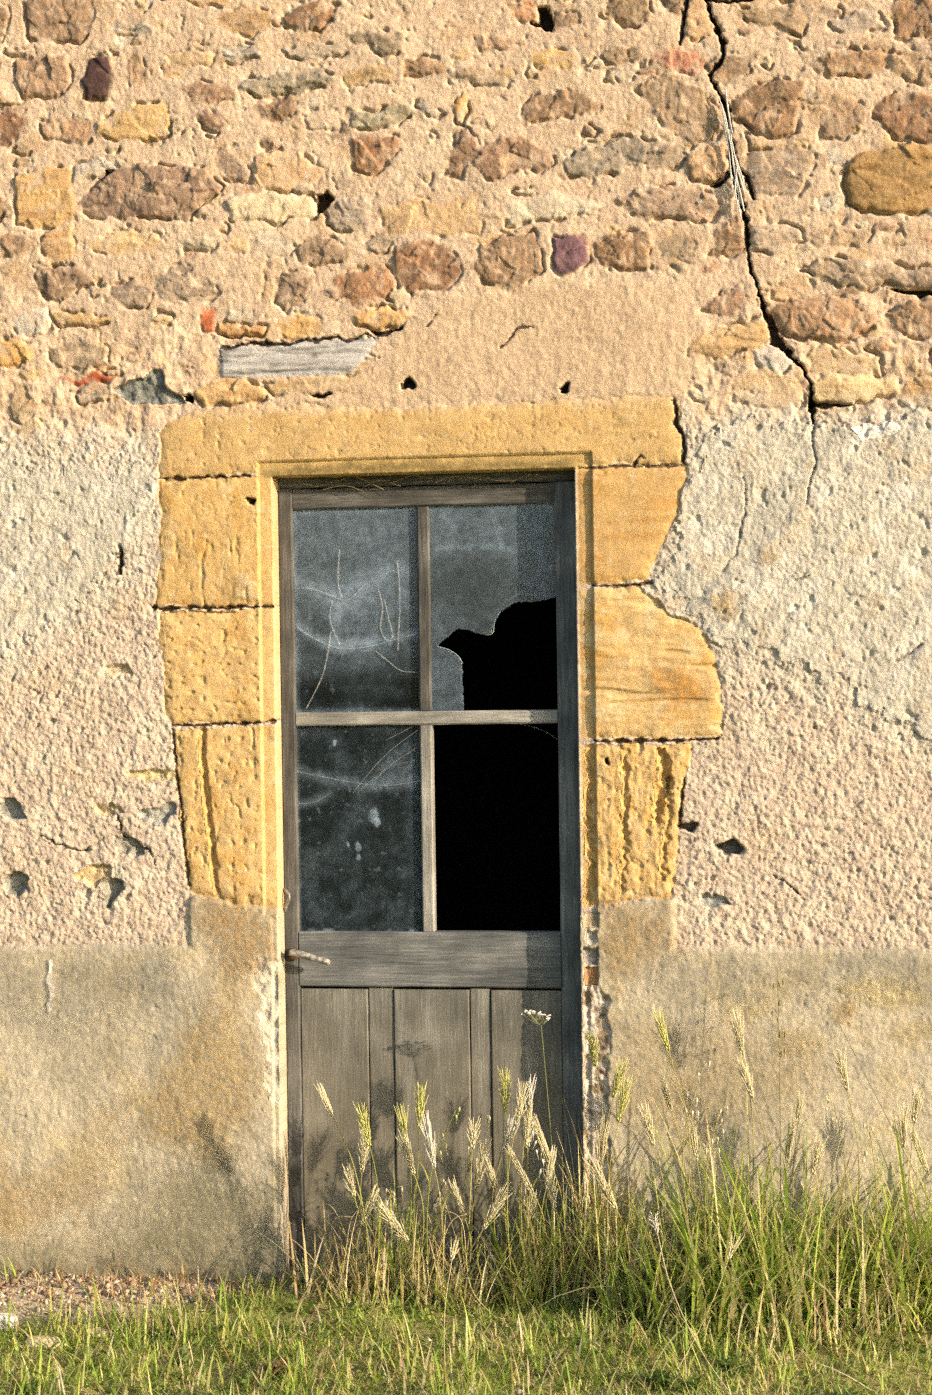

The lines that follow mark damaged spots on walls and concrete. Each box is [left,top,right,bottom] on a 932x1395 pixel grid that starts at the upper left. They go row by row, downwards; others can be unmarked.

crack [678,0,854,425]
crack [671,399,687,463]
spalling [0,798,27,819]
spalling [3,872,29,897]
spalling [73,832,145,908]
spalling [94,801,177,826]
spalling [617,743,631,894]
spalling [649,747,698,883]
spalling [714,839,744,855]
leakage [46,960,54,1012]
peeling [580,743,613,1285]
leakage [148,1020,257,1159]